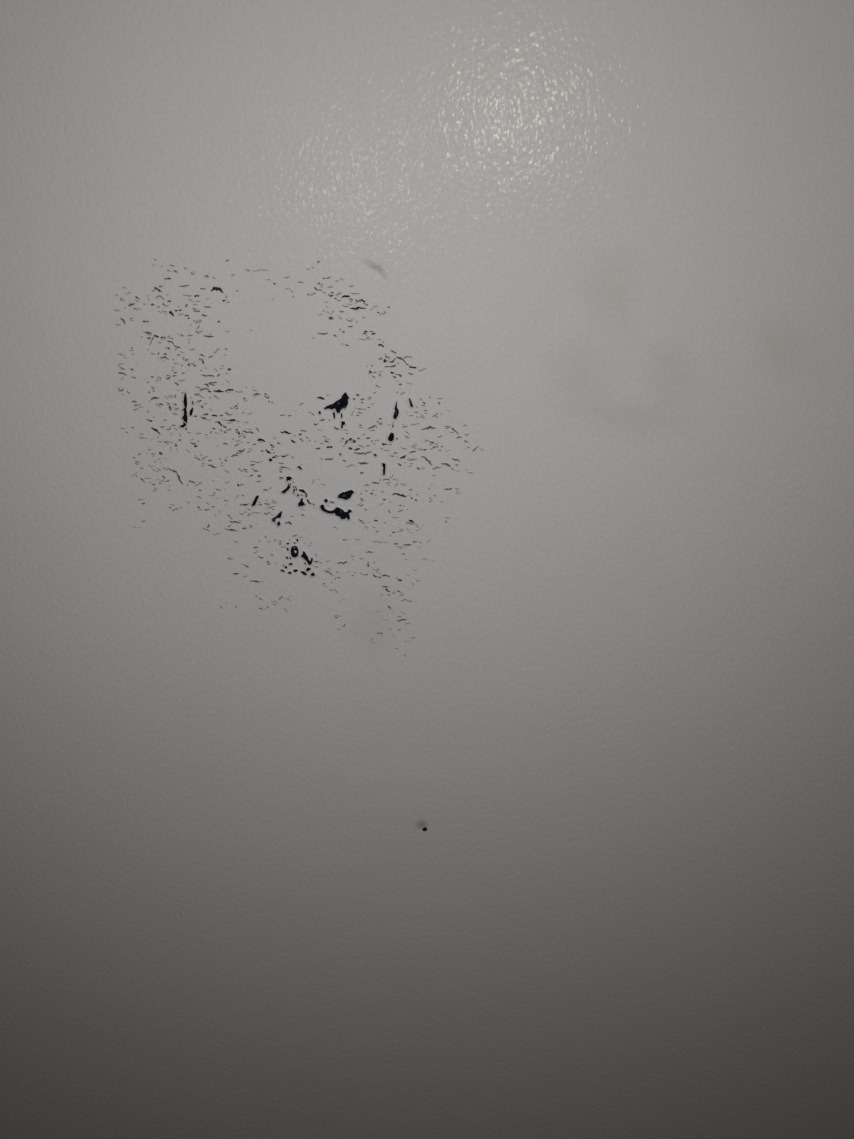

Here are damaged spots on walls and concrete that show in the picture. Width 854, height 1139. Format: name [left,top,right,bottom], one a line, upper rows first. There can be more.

peeling [316,390,351,431]
peeling [385,399,402,444]
peeling [270,464,357,528]
spalling [279,537,318,578]